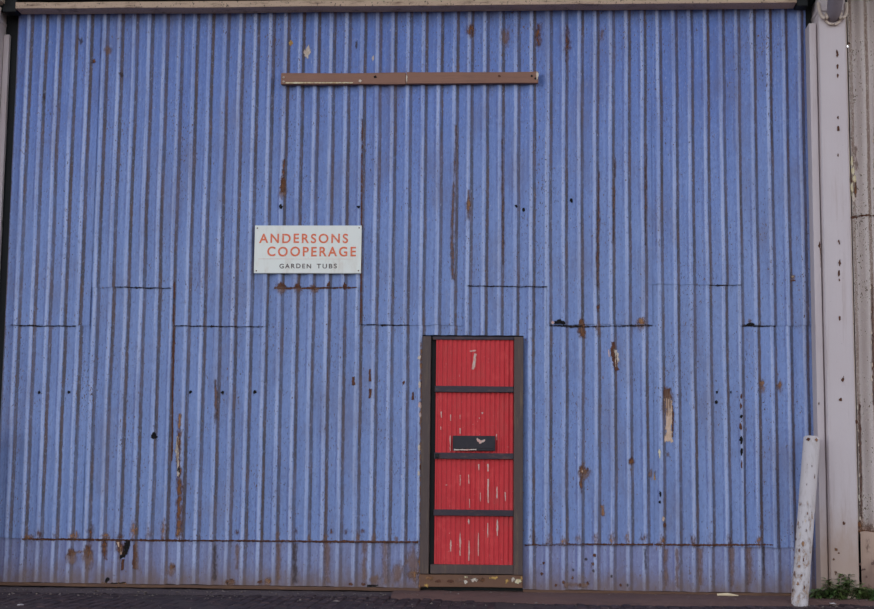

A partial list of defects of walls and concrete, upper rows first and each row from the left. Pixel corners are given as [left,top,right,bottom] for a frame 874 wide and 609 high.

rust [274,243,408,327]
rust [22,282,420,587]
rust [579,463,589,492]
peeling [450,520,498,561]